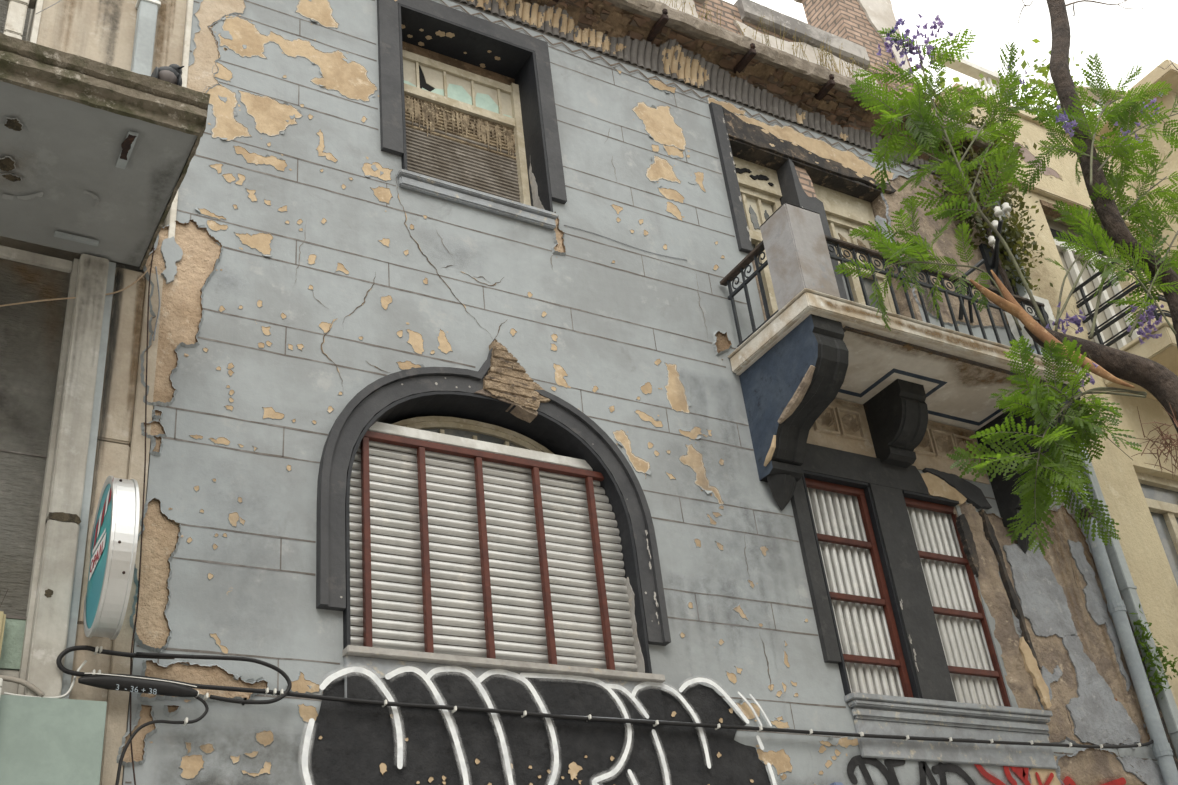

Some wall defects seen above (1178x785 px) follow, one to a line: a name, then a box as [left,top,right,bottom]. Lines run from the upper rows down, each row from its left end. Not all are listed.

peeling [401,24,455,46]
spalling [522,0,1008,329]
crack [295,221,376,395]
crack [396,177,507,339]
spalling [435,328,571,423]
peeling [612,358,724,526]
spalling [116,496,269,767]
spalling [920,468,1164,785]